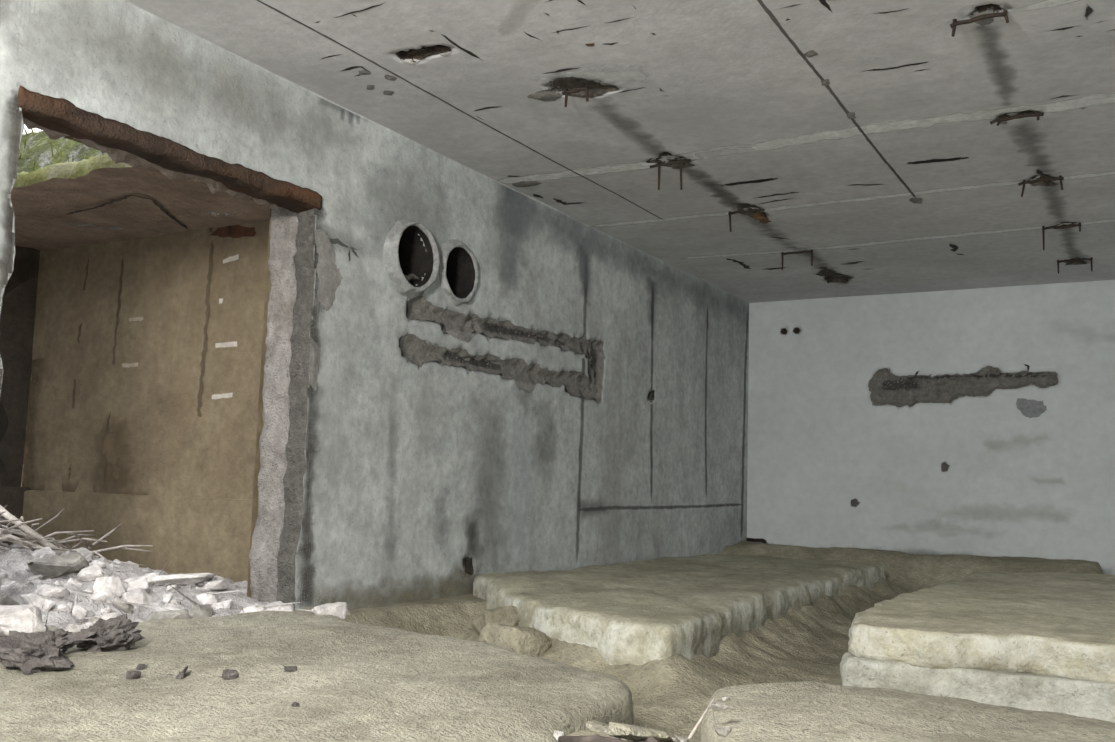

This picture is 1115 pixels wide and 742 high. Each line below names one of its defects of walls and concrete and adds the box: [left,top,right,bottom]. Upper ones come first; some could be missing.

spalling [961,4,1008,26]
spalling [396,45,452,65]
spalling [342,66,397,95]
spalling [528,68,645,102]
spalling [646,148,753,169]
spalling [1027,170,1061,186]
peeling [882,380,919,390]
peeling [1016,398,1046,418]